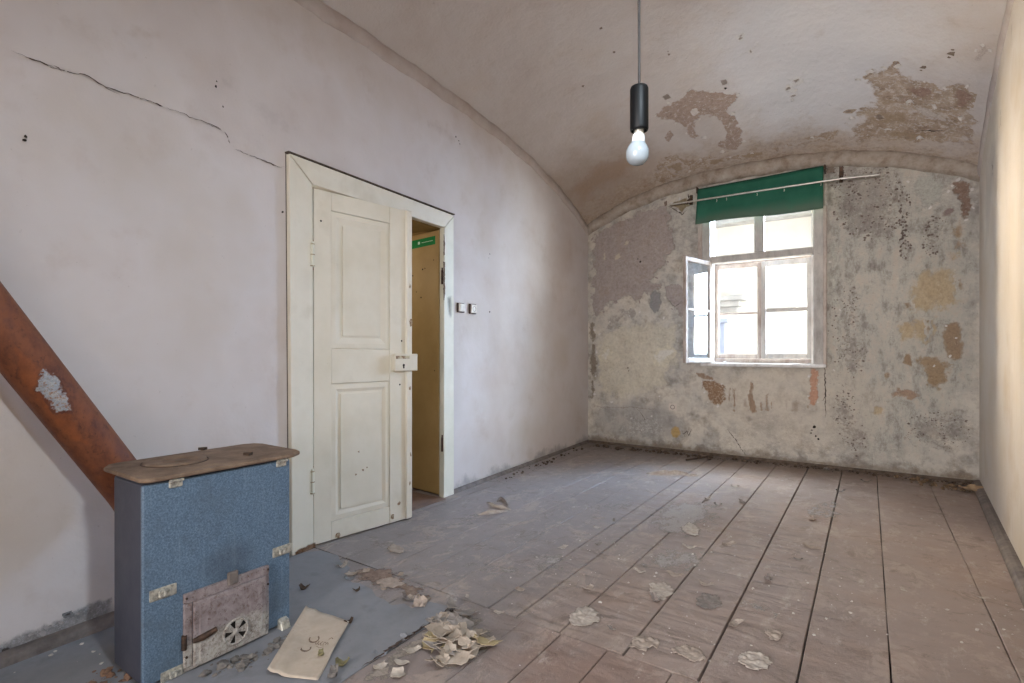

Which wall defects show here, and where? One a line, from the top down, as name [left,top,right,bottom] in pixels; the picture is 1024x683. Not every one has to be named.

crack [11,50,278,167]
peeling [648,58,987,184]
peeling [901,172,975,222]
peeling [588,195,774,440]
water stain [589,110,1000,480]
corrosion [8,340,92,446]